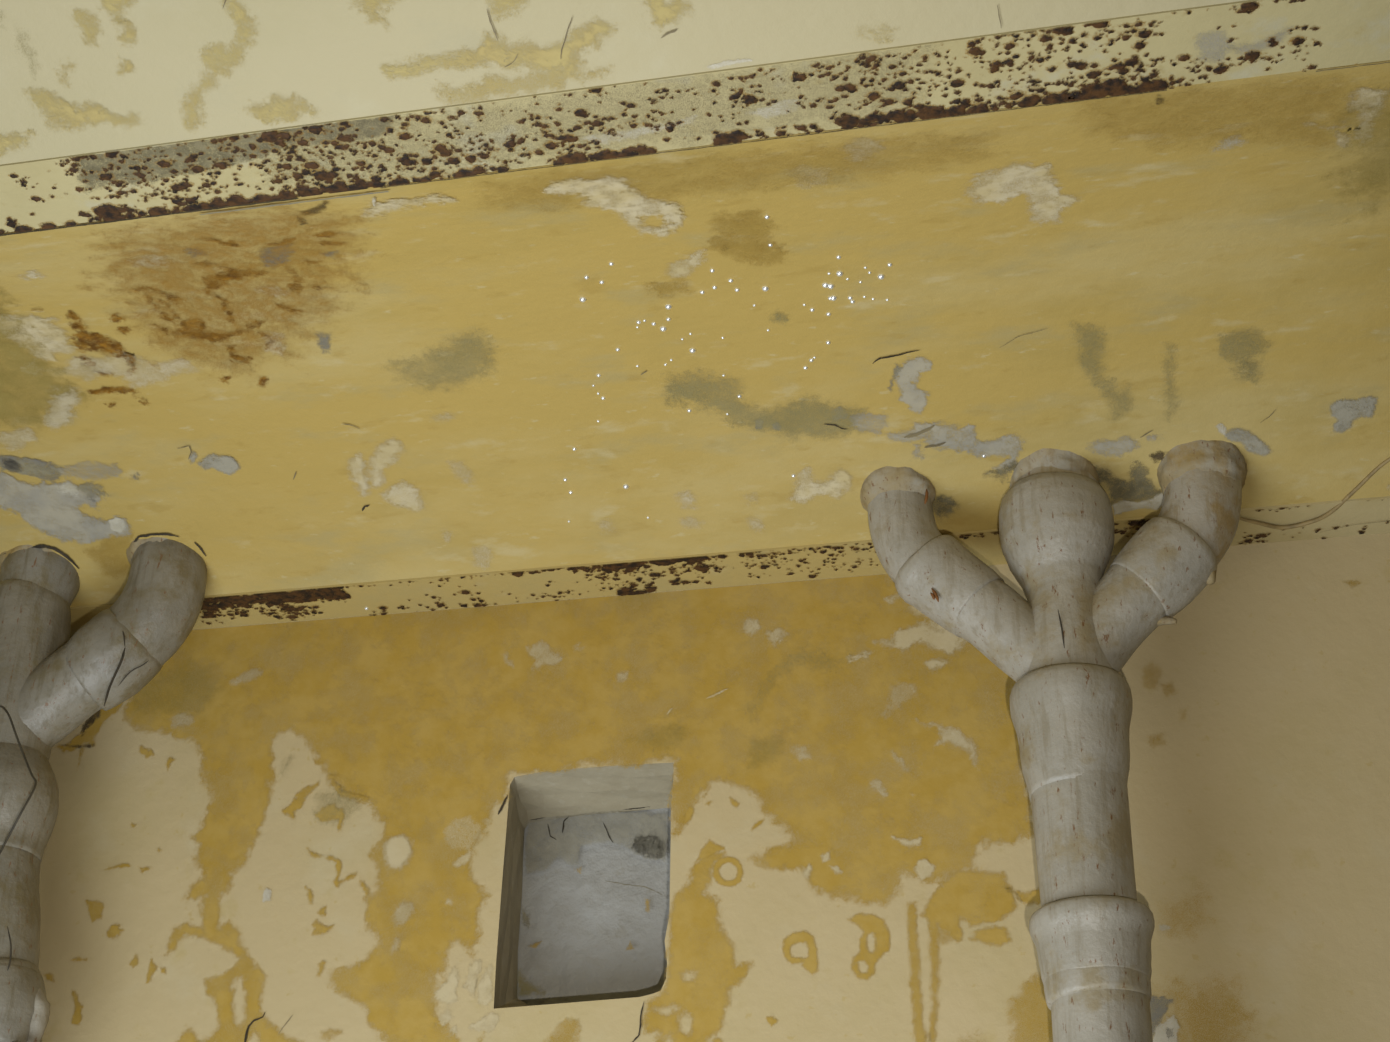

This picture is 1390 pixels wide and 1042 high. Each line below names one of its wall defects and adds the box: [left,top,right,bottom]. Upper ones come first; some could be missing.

rust [0,0,1322,247]
peeling [0,314,206,452]
rust [66,310,149,408]
flaking render [0,460,139,545]
rust [1114,519,1150,538]
rust [1237,521,1390,545]
rust [200,542,878,625]
peeling [129,892,304,1042]
peeling [282,774,369,832]
peeling [381,833,415,871]
peeling [639,838,755,1042]
peeling [891,836,1040,947]